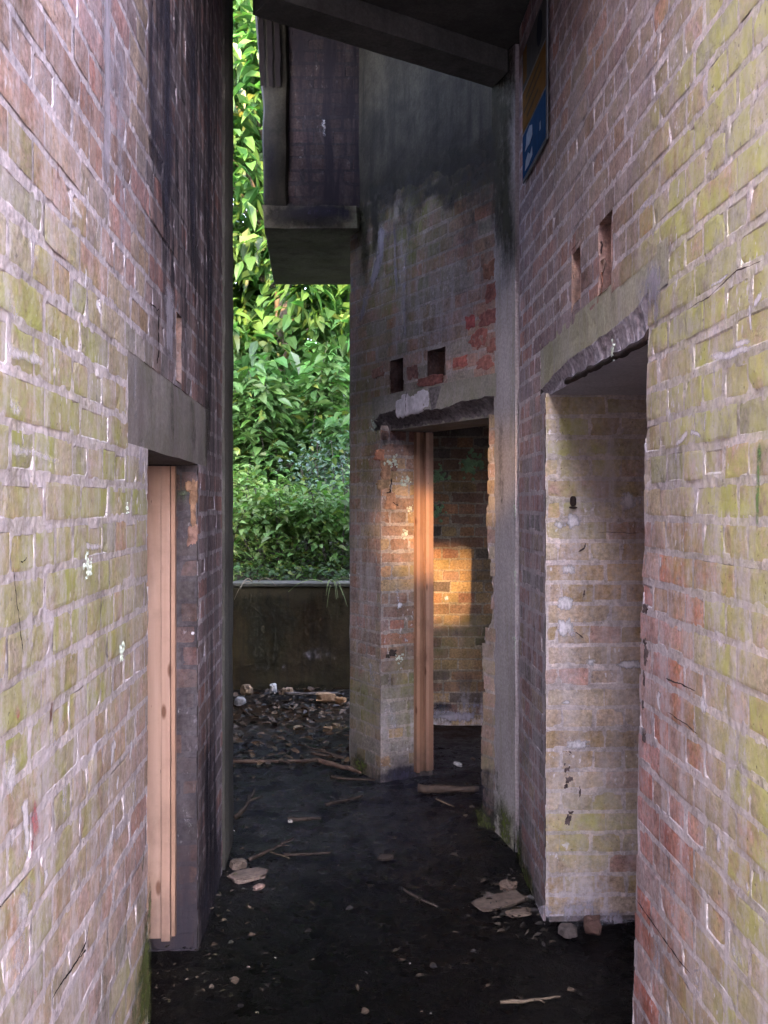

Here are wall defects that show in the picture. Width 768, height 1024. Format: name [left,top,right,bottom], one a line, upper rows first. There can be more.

leakage [492,44,515,263]
leakage [294,202,406,321]
spalling [371,258,496,431]
crack [635,898,690,973]